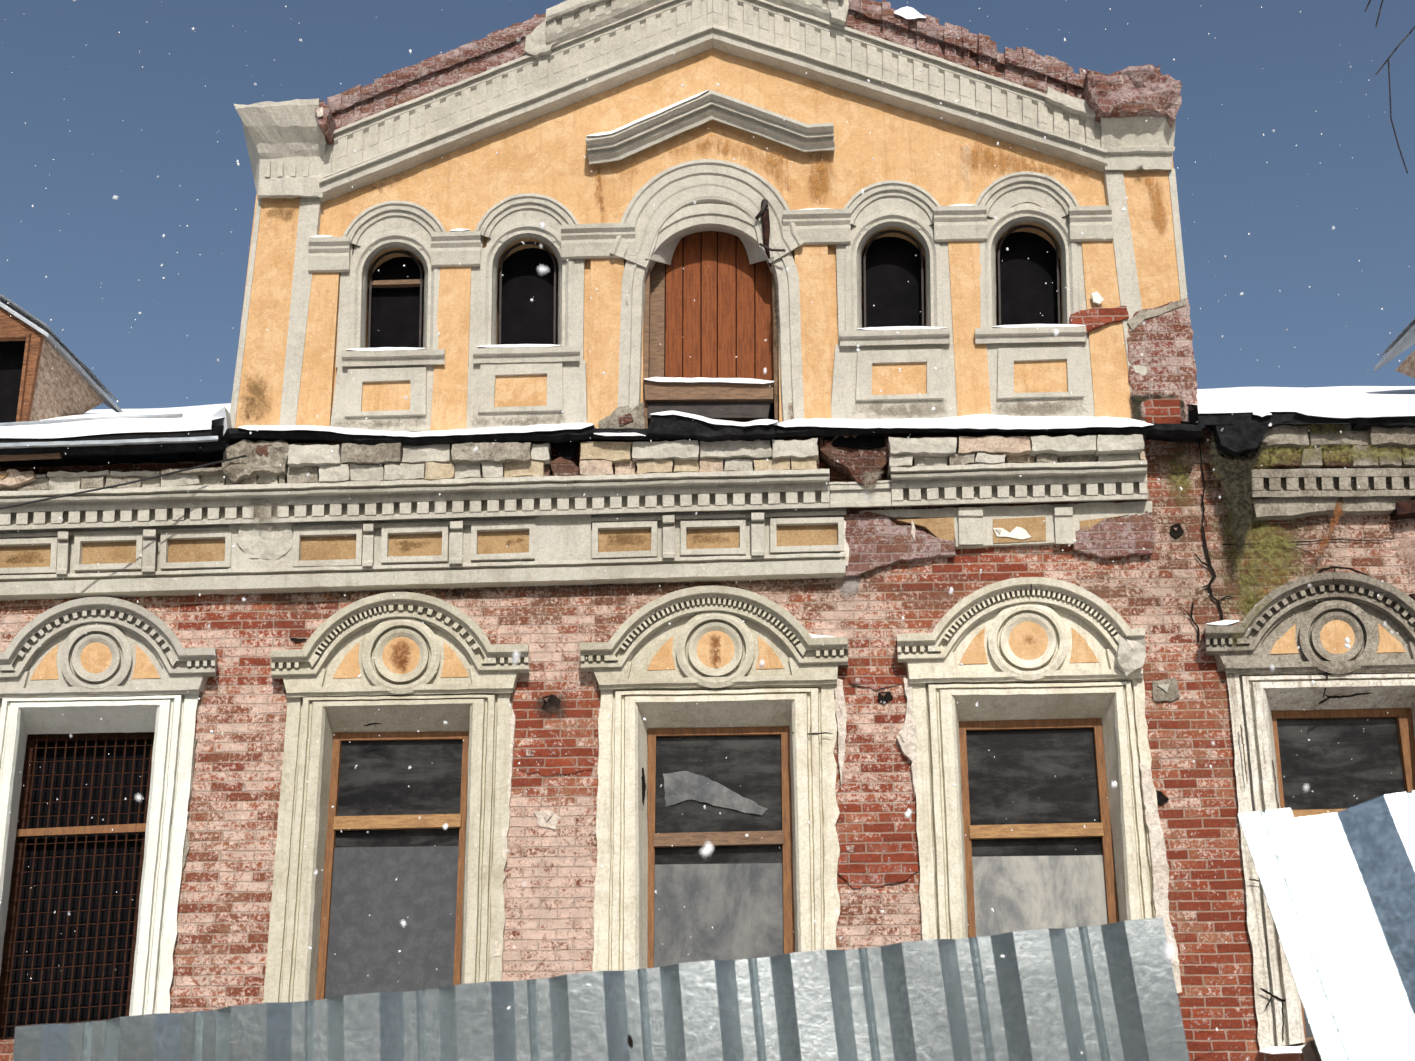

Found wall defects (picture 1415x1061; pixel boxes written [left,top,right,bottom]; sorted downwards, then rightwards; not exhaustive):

spalling [1069,292,1198,425]
peeling [823,435,886,449]
spalling [840,512,956,578]
peeling [993,527,1031,540]
damp [1209,429,1268,557]
crack [1186,442,1396,644]